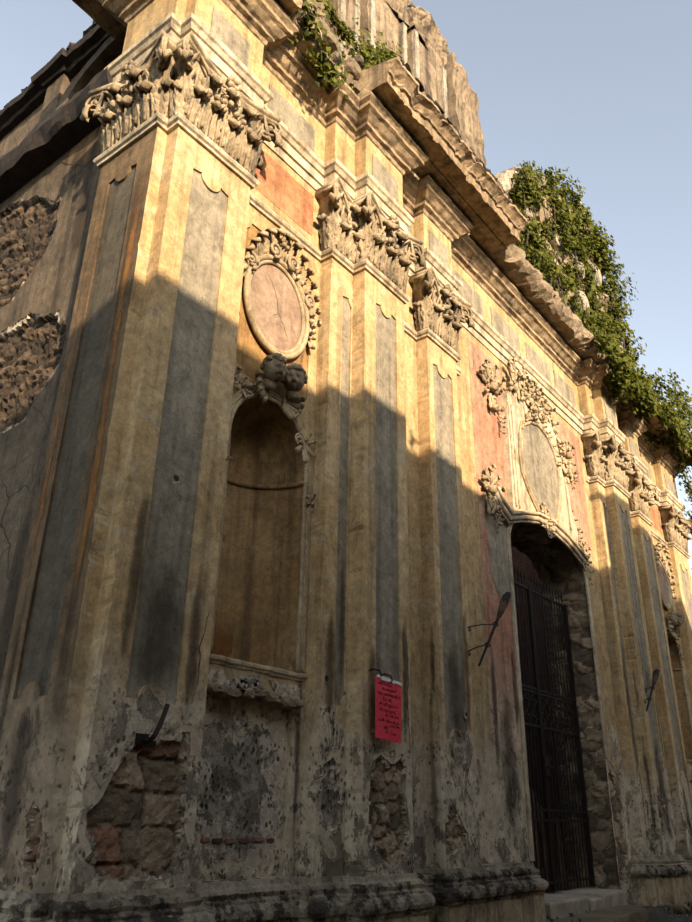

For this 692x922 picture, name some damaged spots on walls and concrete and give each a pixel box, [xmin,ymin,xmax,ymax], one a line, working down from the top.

spalling [0,195,62,308]
spalling [0,310,66,433]
crack [0,453,46,589]
water stain [3,728,23,847]
spalling [85,687,195,885]
flaking render [201,816,286,859]
spalling [363,745,411,874]